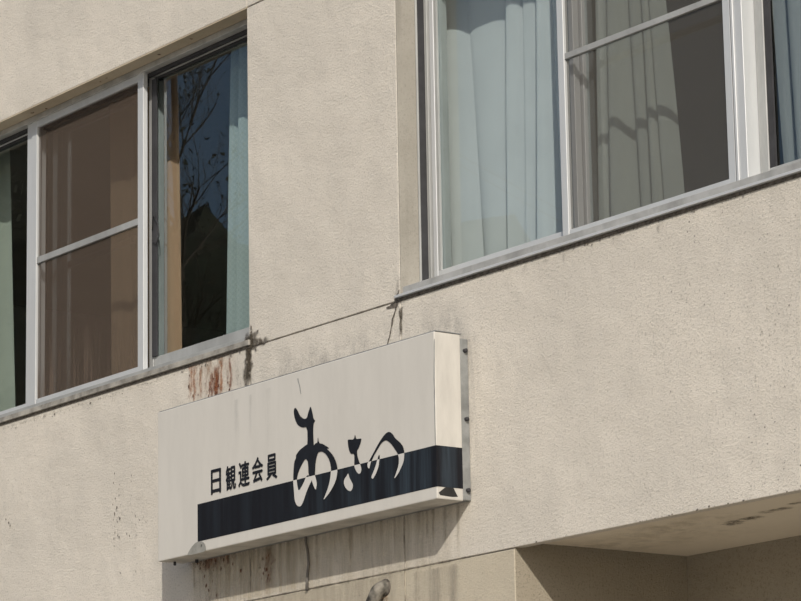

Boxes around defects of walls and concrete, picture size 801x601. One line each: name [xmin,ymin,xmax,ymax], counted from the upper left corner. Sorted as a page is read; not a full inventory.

crack [386,290,399,344]
corrosion [188,359,231,397]
leakage [230,326,266,385]